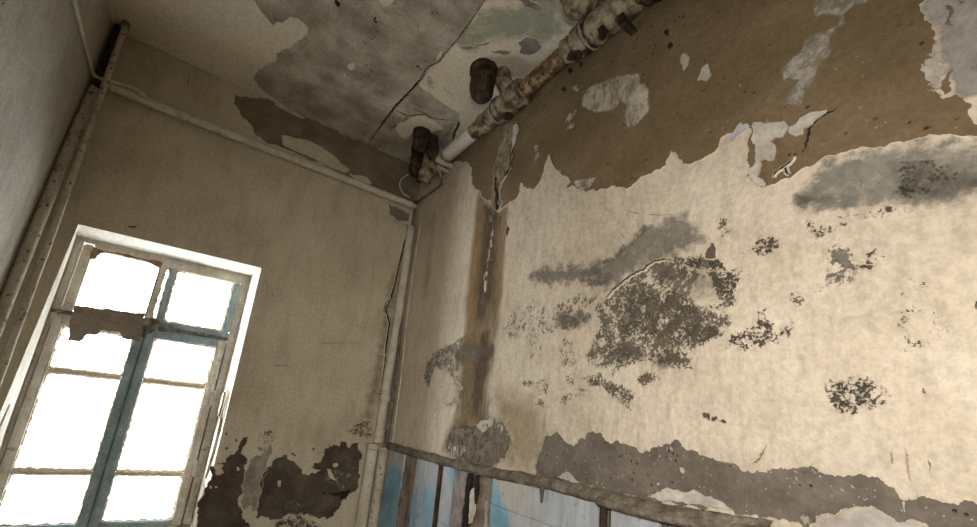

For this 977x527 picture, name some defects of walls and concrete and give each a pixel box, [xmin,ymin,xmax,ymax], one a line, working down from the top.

spalling [233,0,542,222]
crack [367,0,486,144]
flaking render [451,0,977,213]
leakage [794,140,977,239]
crack [375,231,407,396]
leakage [503,214,793,415]
leakage [820,246,884,292]
flaking render [0,404,11,448]
flaking render [191,386,363,527]
flaking render [535,430,977,527]
leakage [824,375,891,416]